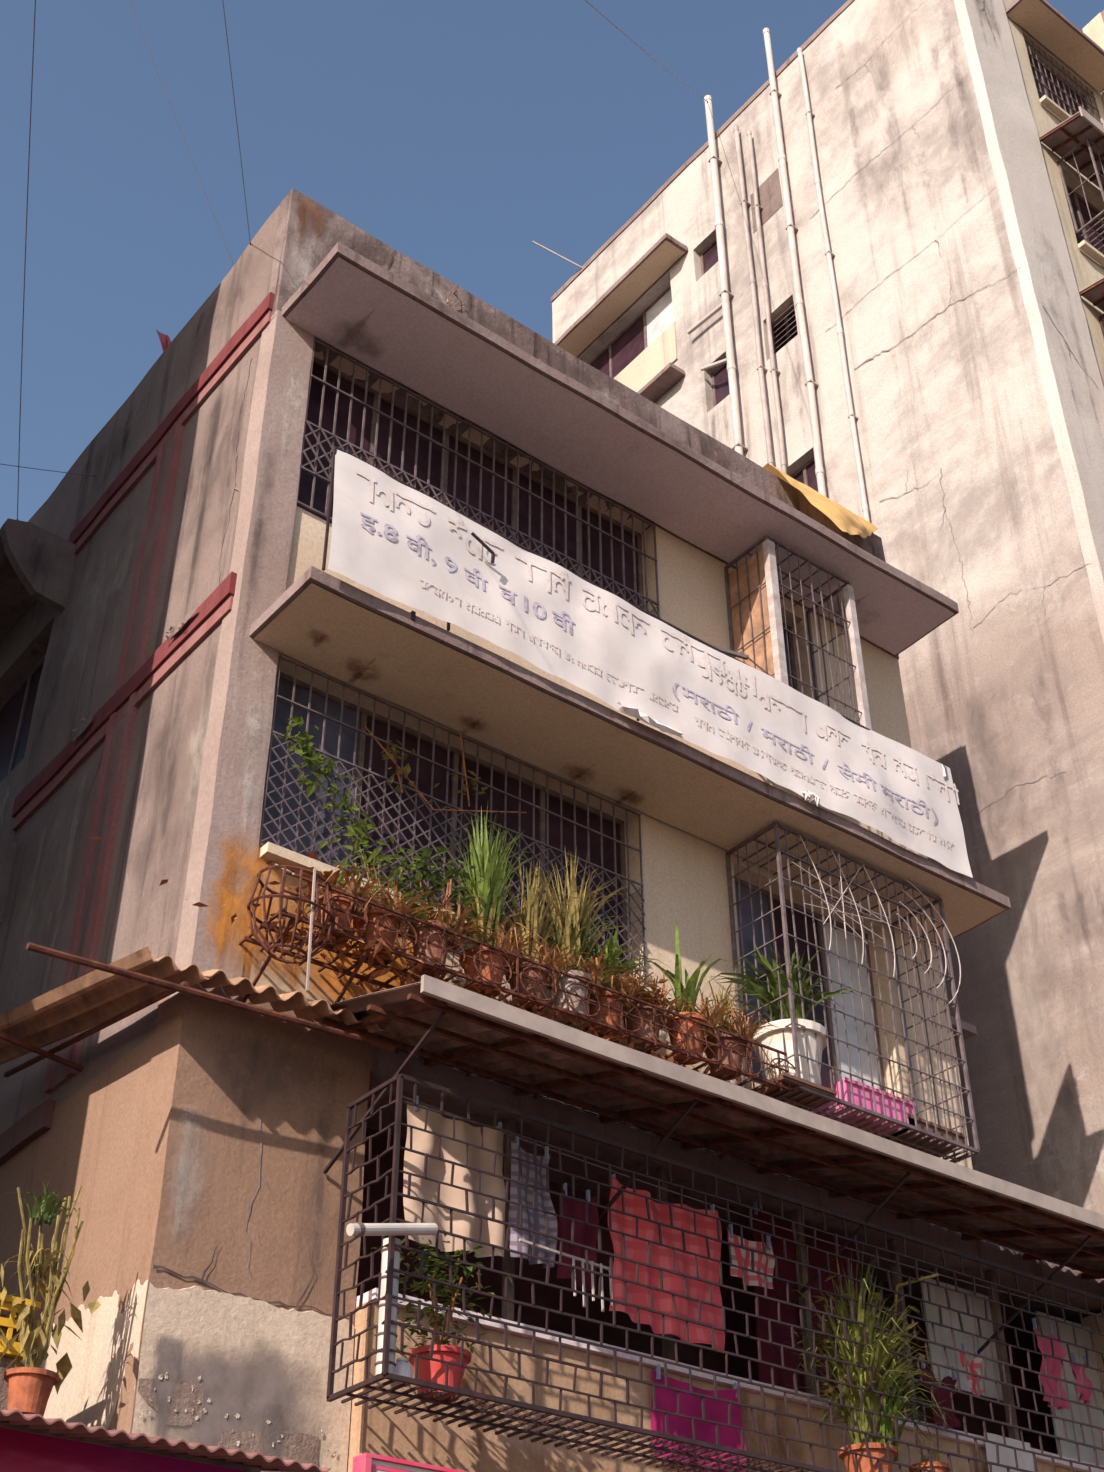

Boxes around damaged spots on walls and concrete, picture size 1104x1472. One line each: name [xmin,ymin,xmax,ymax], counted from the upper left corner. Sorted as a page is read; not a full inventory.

rust [213,850,421,1002]
crack [153,1115,349,1319]